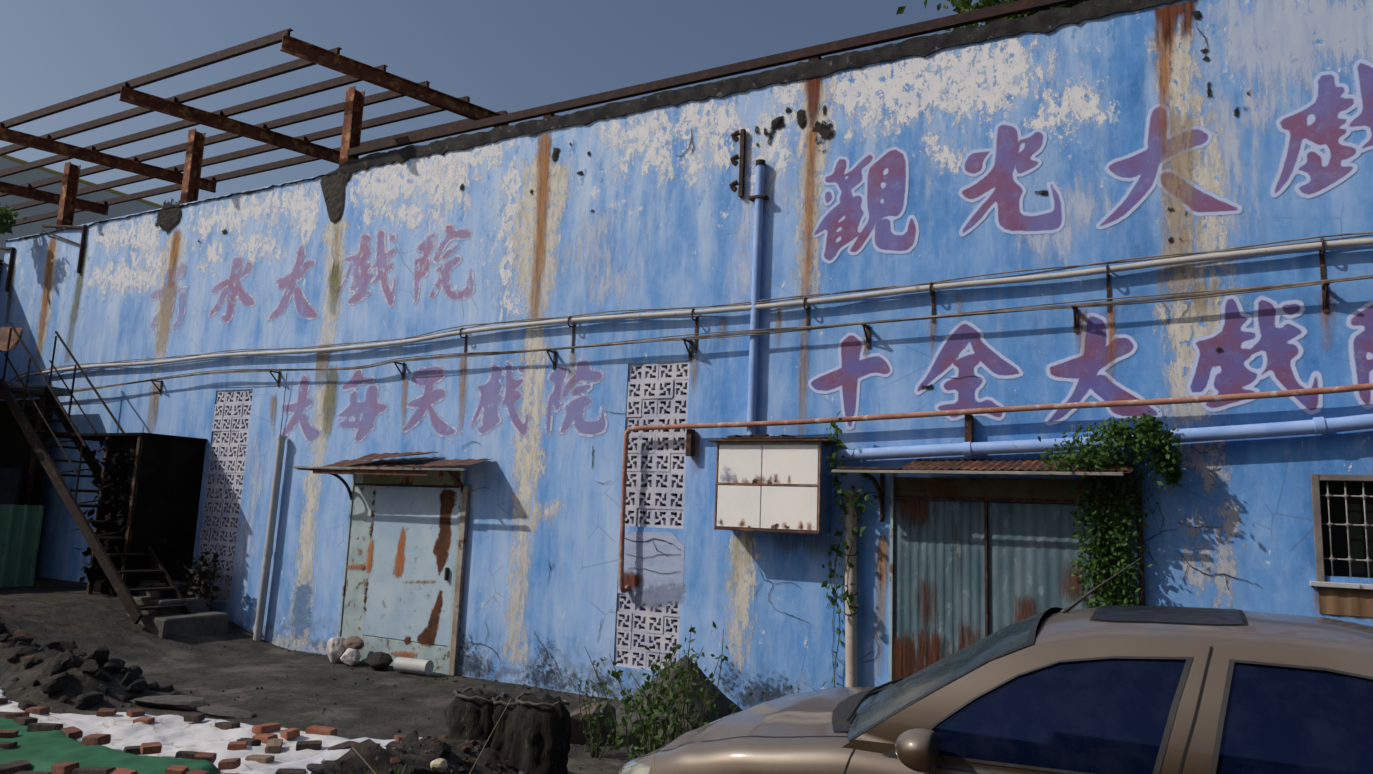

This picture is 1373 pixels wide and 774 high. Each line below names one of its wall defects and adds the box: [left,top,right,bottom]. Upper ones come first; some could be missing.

rust [35,237,58,361]
rust [148,229,187,416]
peeling [82,139,535,331]
leakage [319,218,349,347]
rust [503,133,572,665]
rust [791,76,837,307]
peeling [552,32,1111,303]
rust [1146,1,1233,302]
leakage [1155,281,1237,428]
crack [625,538,681,574]
leakage [715,531,796,709]
peeling [1175,440,1247,608]